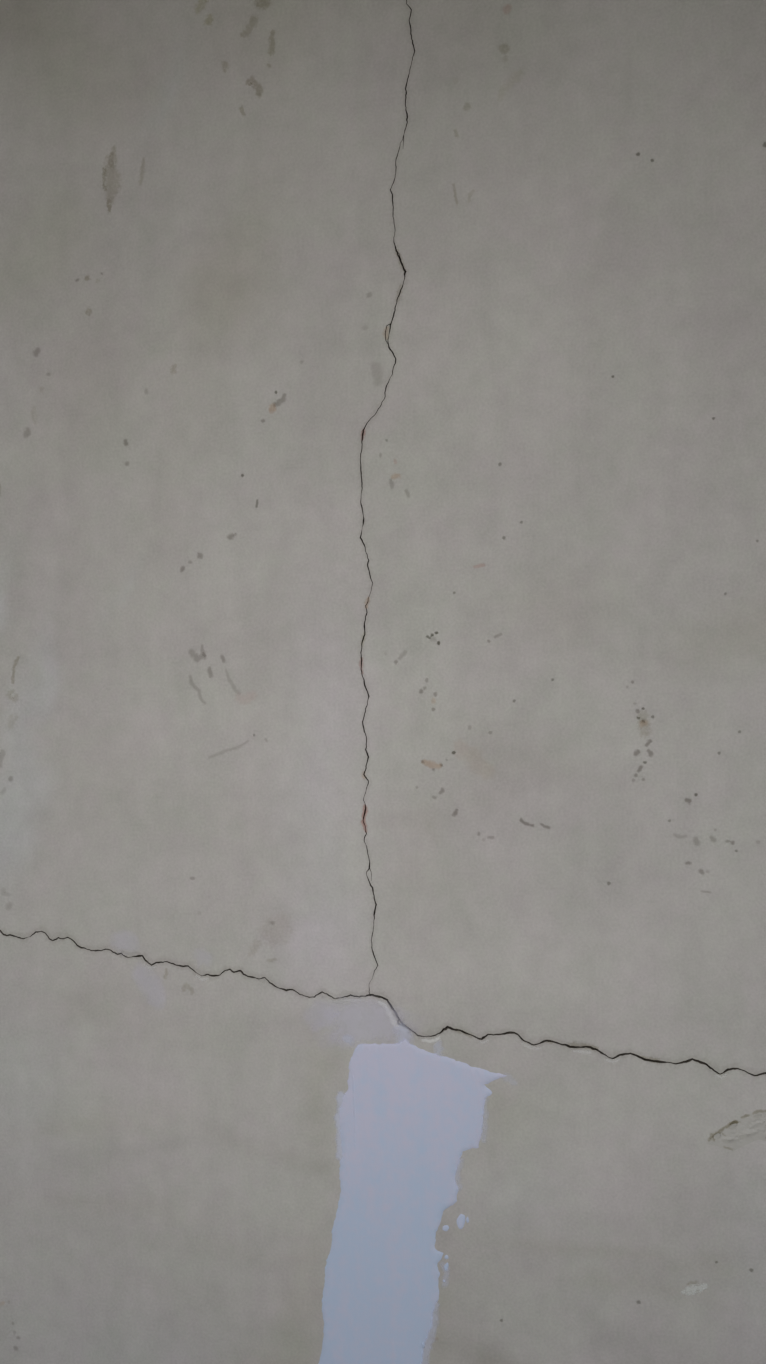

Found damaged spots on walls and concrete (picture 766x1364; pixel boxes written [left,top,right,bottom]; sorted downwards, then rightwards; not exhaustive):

crack [0,0,766,1076]
spalling [706,1110,766,1150]